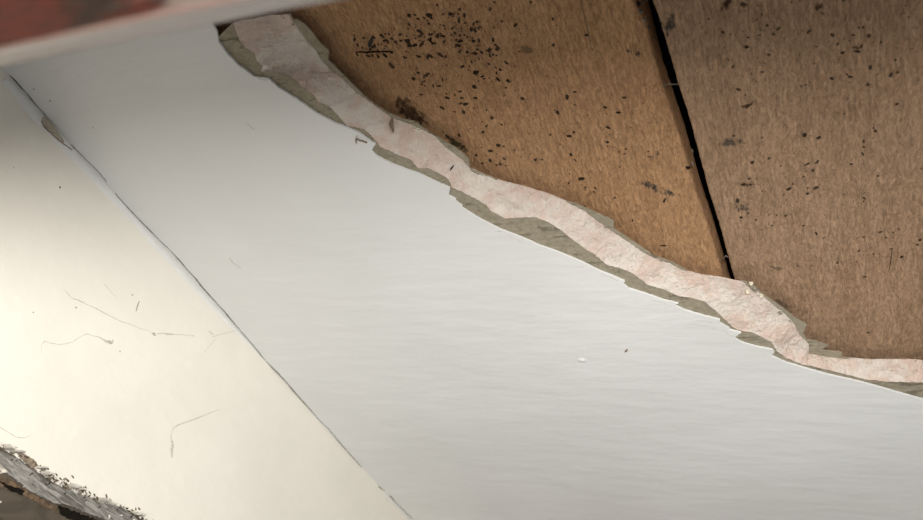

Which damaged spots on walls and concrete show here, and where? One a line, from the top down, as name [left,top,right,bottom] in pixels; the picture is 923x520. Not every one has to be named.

water stain [353,1,543,167]
water stain [718,0,792,109]
water stain [813,19,902,80]
spalling [219,13,923,398]
water stain [736,156,835,230]
peeling [0,444,153,520]